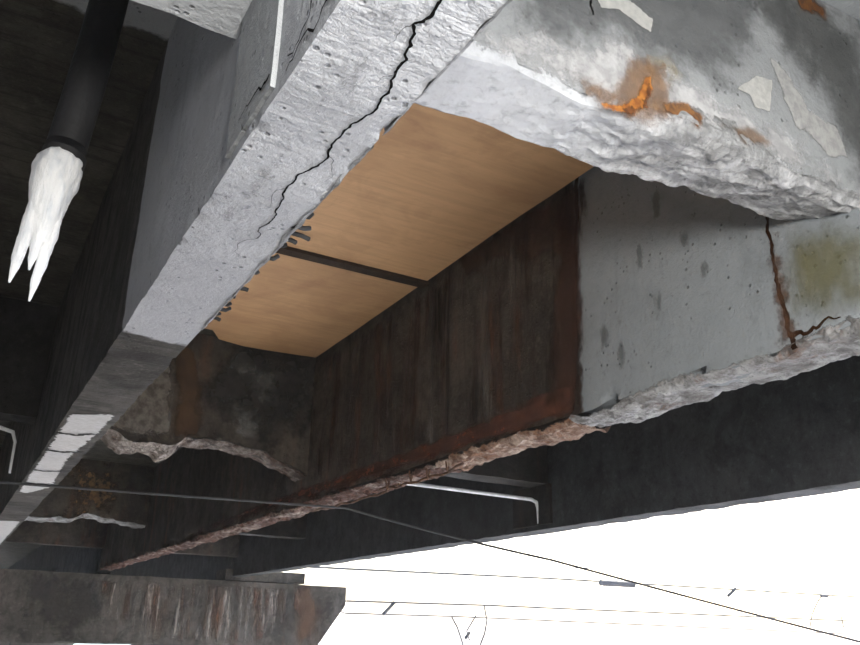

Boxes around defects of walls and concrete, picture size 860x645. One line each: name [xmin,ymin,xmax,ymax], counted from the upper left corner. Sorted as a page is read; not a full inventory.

crack [235,0,442,257]
spalling [382,0,860,220]
rust [586,59,703,128]
rust [737,128,765,142]
crack [765,216,841,350]
spalling [0,513,146,544]
rust [62,459,128,518]
peeling [20,414,306,493]
water stain [199,345,315,454]
spalling [100,315,860,571]